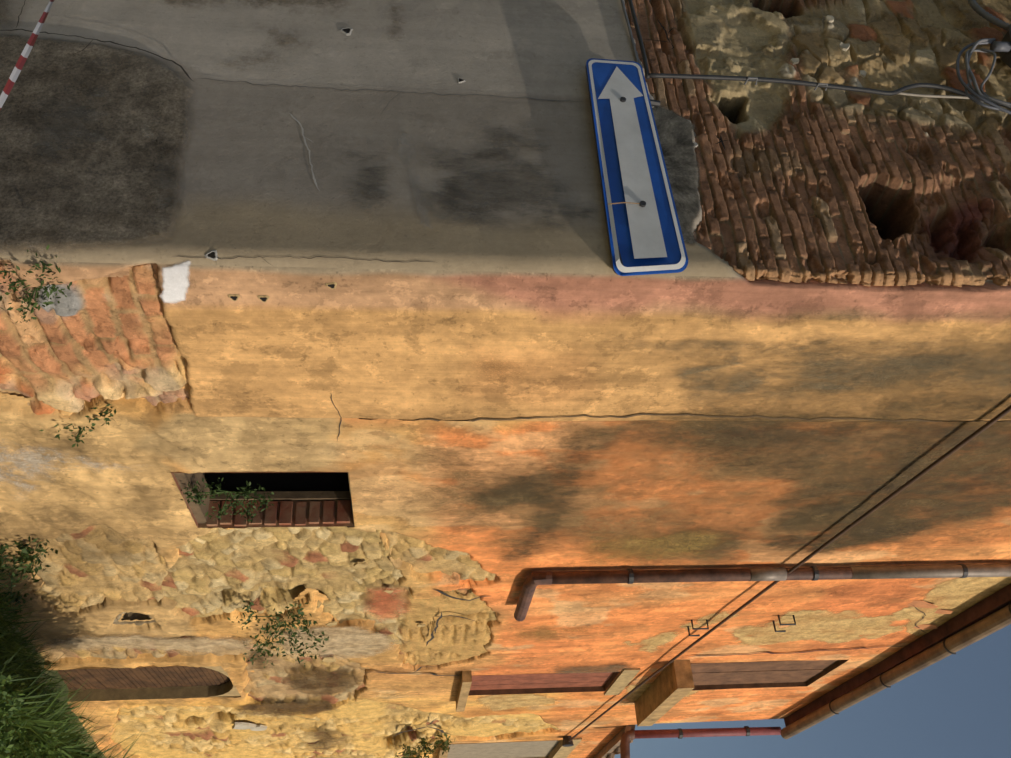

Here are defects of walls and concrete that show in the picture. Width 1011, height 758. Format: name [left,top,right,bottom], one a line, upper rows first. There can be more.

crack [0,0,583,112]
damp [0,35,189,251]
crack [289,113,319,190]
flaking render [624,0,1011,287]
flaking render [0,262,189,416]
crack [331,394,1011,442]
damp [436,341,1011,561]
flaking render [23,524,497,665]
flaking render [34,636,559,758]
crack [378,589,486,676]